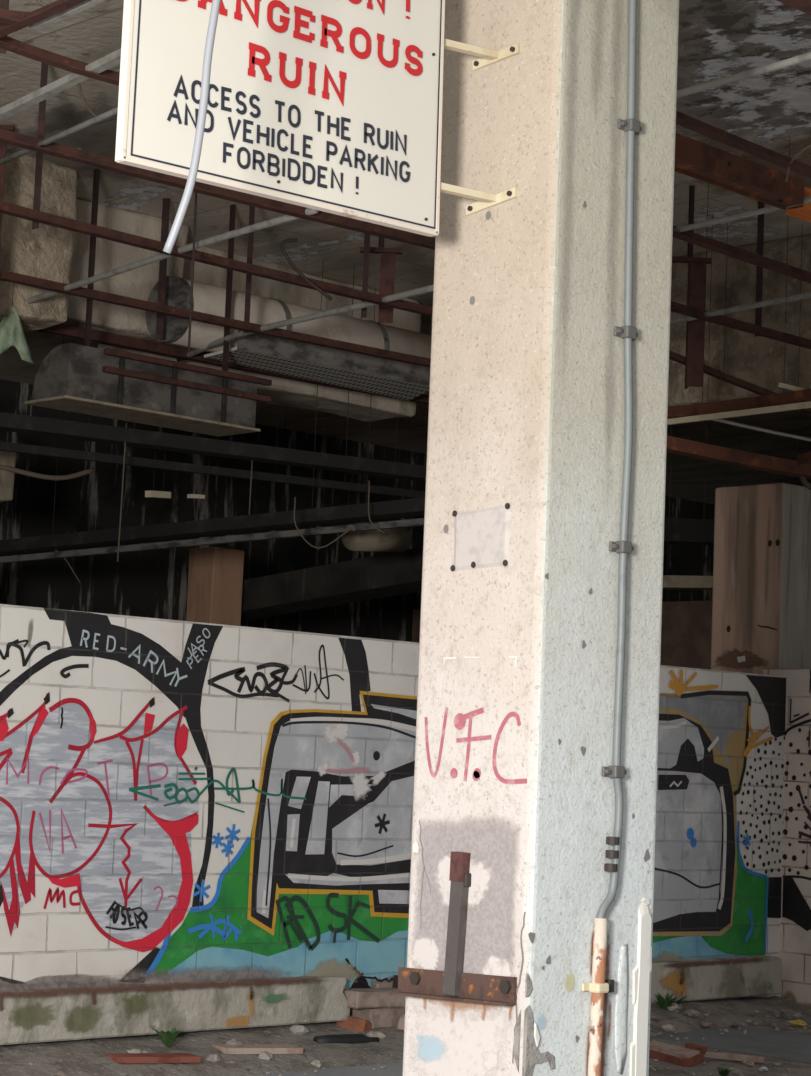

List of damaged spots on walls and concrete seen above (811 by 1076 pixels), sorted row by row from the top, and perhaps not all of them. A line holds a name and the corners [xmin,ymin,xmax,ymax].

water stain [676,0,811,189]
rust [424,998,491,1020]
spalling [514,973,555,1076]
rust [601,993,611,1076]